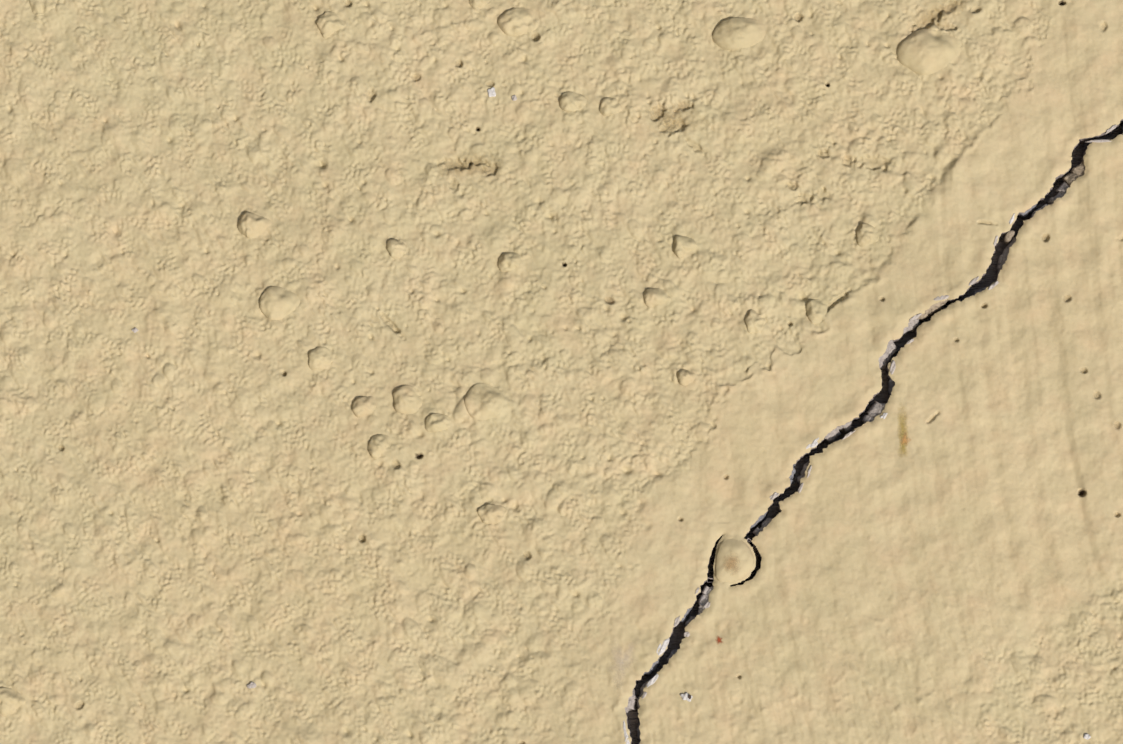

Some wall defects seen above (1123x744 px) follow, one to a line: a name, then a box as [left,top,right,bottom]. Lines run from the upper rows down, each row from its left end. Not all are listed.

crack [623,119,1123,744]